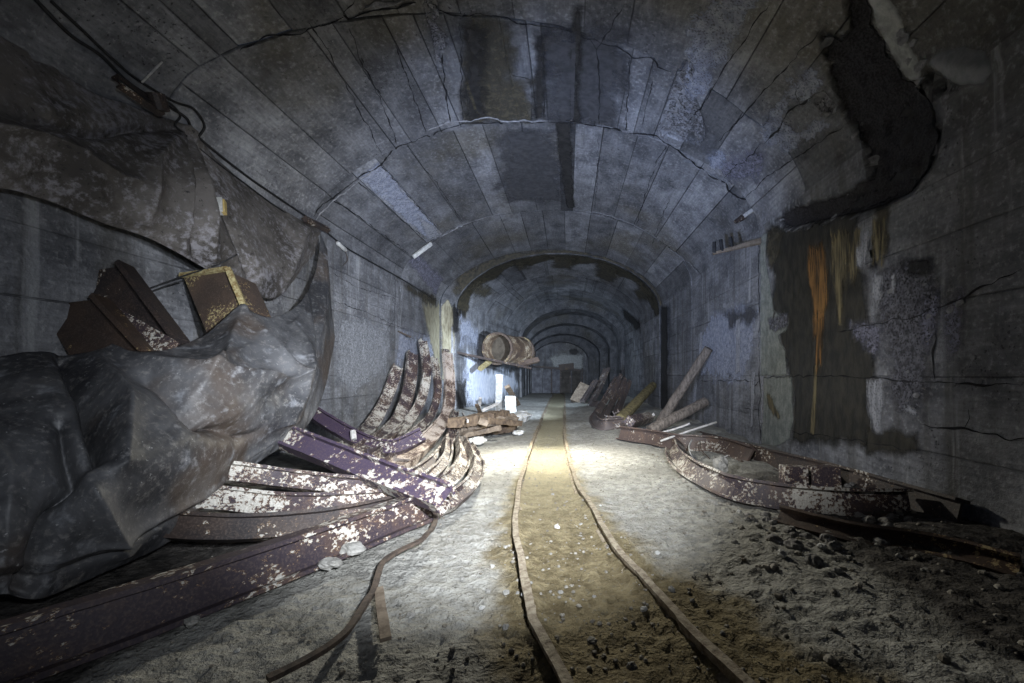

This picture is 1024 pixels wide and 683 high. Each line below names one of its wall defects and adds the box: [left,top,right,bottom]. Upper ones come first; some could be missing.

water stain [460,6,630,208]
crack [241,1,864,354]
spalling [779,0,940,228]
water stain [766,207,918,455]
rust [808,218,886,435]
crack [701,246,1024,444]